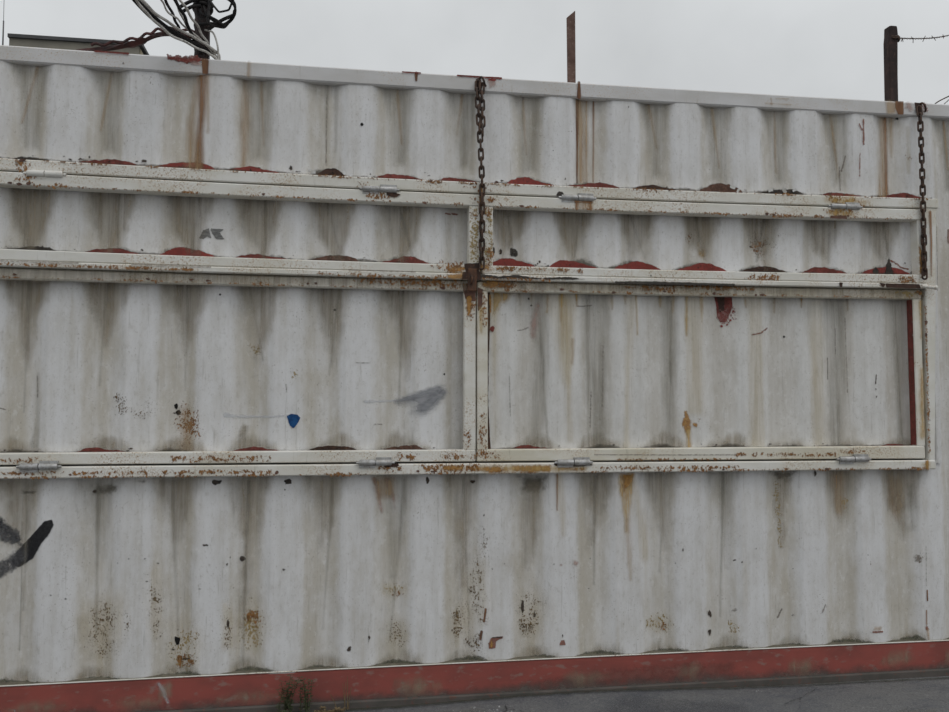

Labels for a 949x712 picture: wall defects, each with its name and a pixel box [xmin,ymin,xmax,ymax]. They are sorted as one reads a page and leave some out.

corrosion [537,81,594,196]
corrosion [765,101,929,220]
corrosion [0,260,211,284]
corrosion [593,273,784,297]
peeling [714,297,737,327]
corrosion [879,198,938,517]
corrosion [174,404,200,443]
corrosion [1,455,279,480]
corrosion [325,411,866,513]
corrosion [224,598,264,649]
corrosion [518,595,545,635]